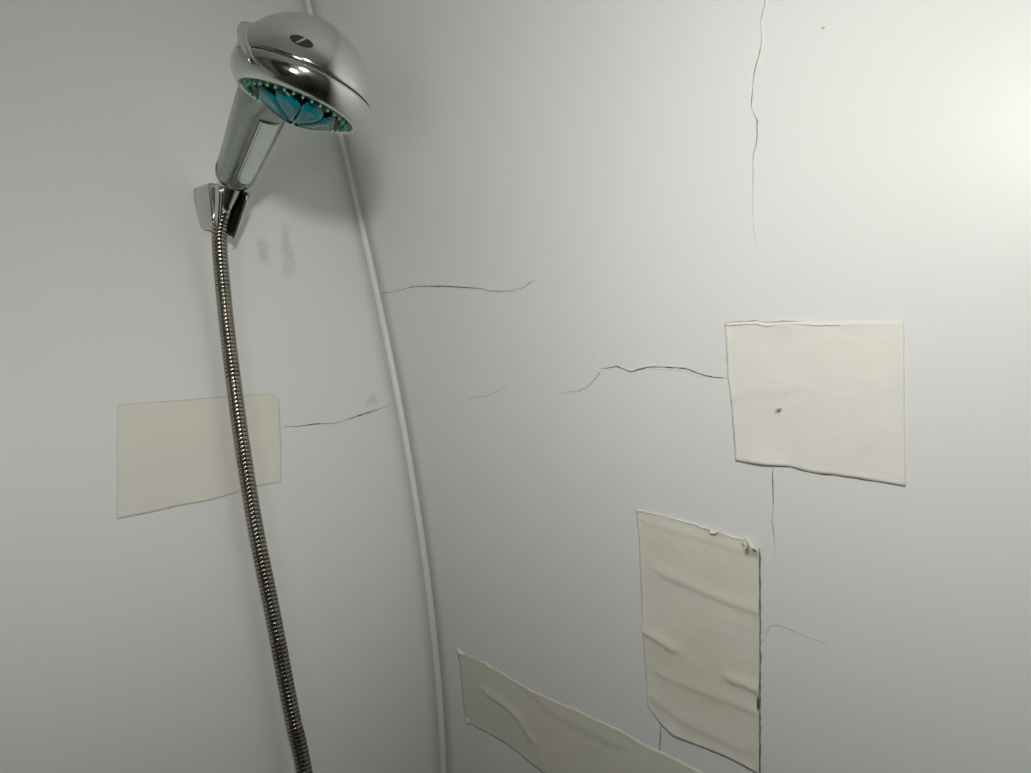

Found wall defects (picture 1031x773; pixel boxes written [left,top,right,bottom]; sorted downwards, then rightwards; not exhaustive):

crack [749,0,767,248]
crack [385,281,538,293]
crack [560,331,722,394]
crack [292,405,390,427]